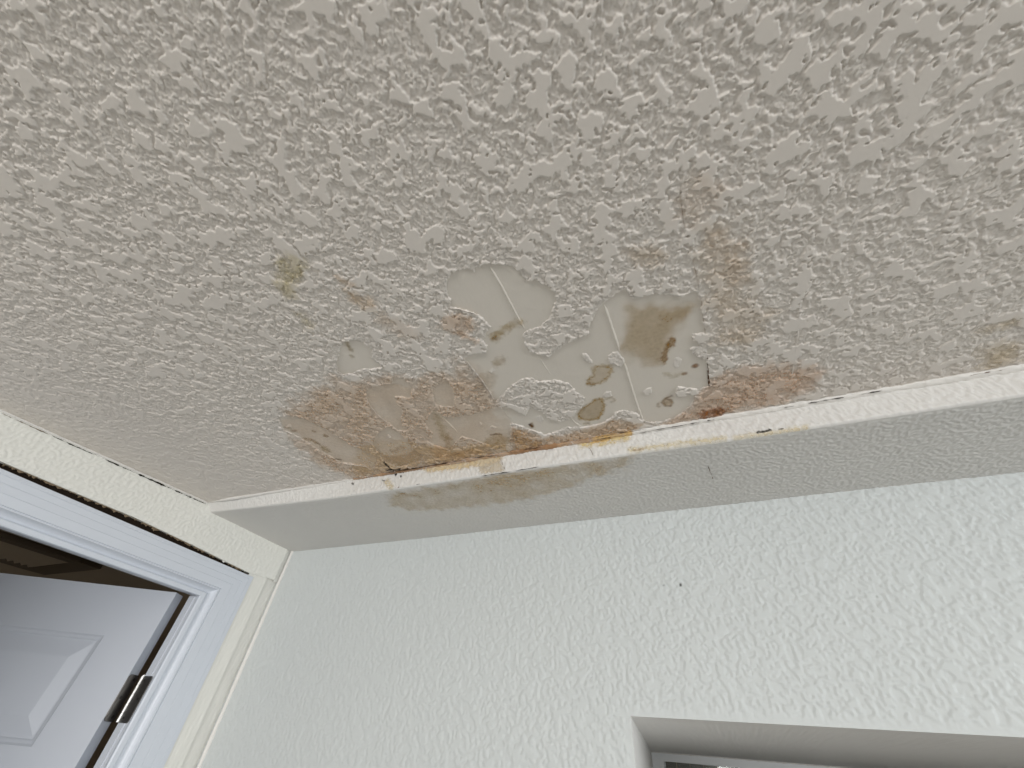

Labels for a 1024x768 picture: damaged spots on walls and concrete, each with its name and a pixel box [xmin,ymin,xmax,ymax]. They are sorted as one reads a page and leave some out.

peeling [425,264,715,450]
damp [352,424,541,484]